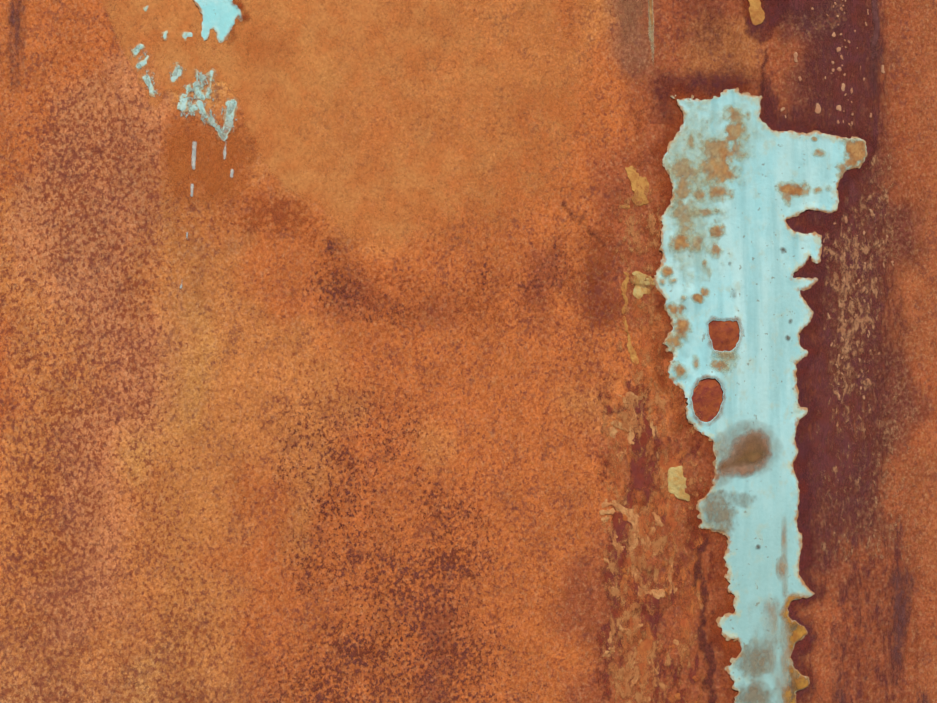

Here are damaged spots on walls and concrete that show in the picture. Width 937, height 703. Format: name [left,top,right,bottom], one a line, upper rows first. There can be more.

peeling [131,43,158,97]
peeling [169,62,239,142]
peeling [181,0,248,43]
peeling [744,0,788,41]
rust [825,0,858,126]
rust [778,183,822,203]
rust [596,106,749,703]
rust [717,426,770,478]
peeling [647,81,874,703]
rust [795,139,911,703]
rust [264,391,537,703]
rust [769,595,809,703]